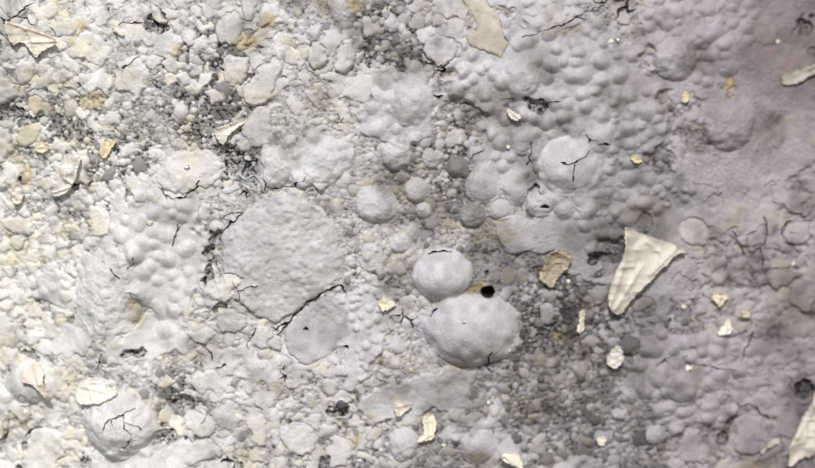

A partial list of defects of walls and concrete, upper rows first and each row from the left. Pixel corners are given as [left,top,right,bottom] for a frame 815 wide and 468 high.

peeling [0,21,57,57]
spalling [587,250,612,266]
peeling [608,227,687,315]
crack [246,284,347,350]
peeling [788,378,815,467]